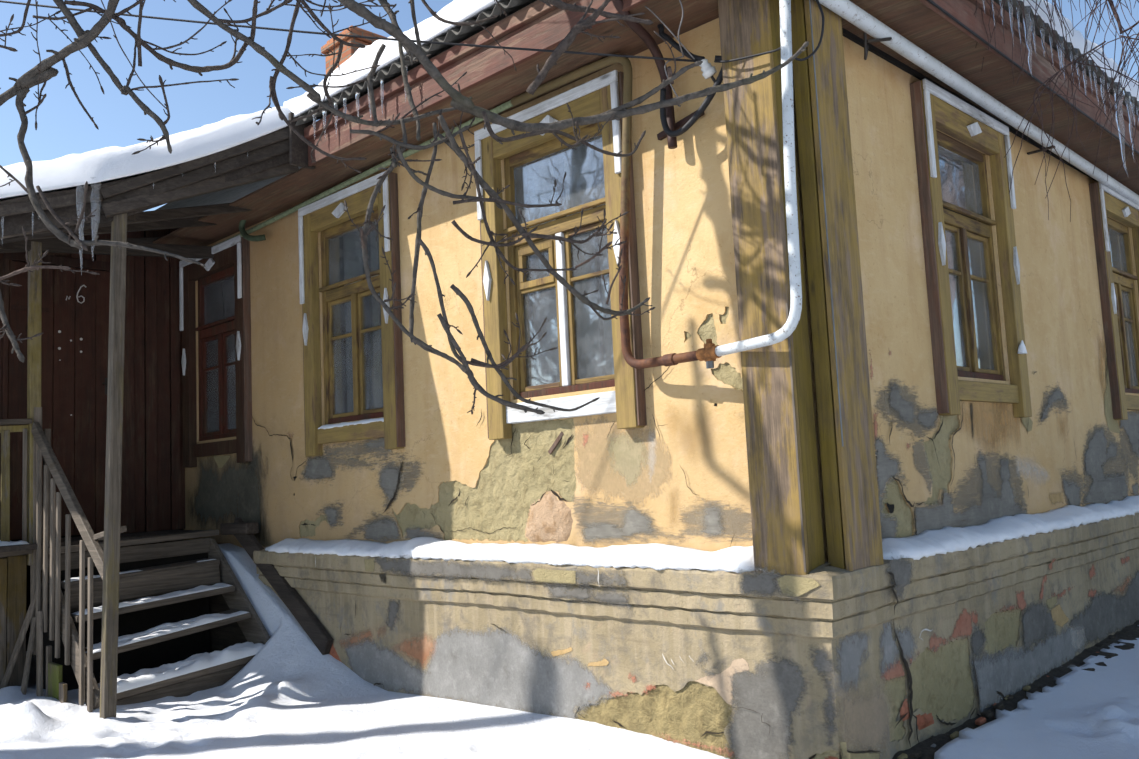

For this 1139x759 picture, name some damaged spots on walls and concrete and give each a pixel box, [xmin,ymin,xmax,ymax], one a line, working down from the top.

flaking render [685,307,729,346]
flaking render [712,363,743,391]
flaking render [393,416,671,542]
flaking render [881,479,912,538]
crack [887,571,1005,747]
flaking render [984,608,1021,655]
flaking render [883,637,974,741]
flaking render [575,681,737,759]
flaking render [809,741,880,759]
crack [839,750,881,759]